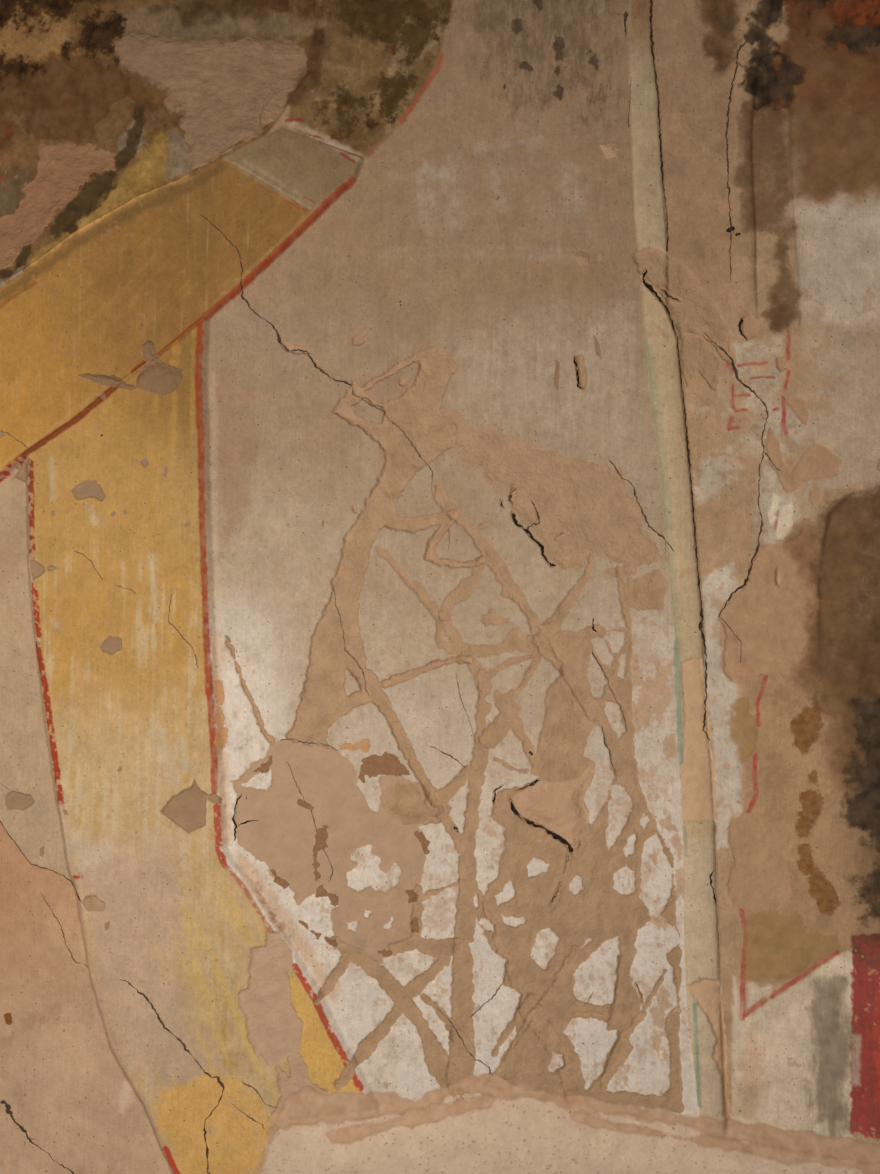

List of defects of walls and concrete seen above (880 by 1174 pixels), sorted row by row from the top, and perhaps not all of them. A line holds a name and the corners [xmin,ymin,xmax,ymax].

leakage [0,0,81,33]
spalling [0,139,118,269]
leakage [0,10,183,238]
leakage [315,0,448,137]
leakage [742,0,803,110]
crack [203,216,433,495]
spalling [574,335,602,389]
crack [609,0,782,741]
spalling [160,346,732,1117]
leakage [791,487,880,917]
crack [0,1100,74,1174]
crack [120,979,279,1174]